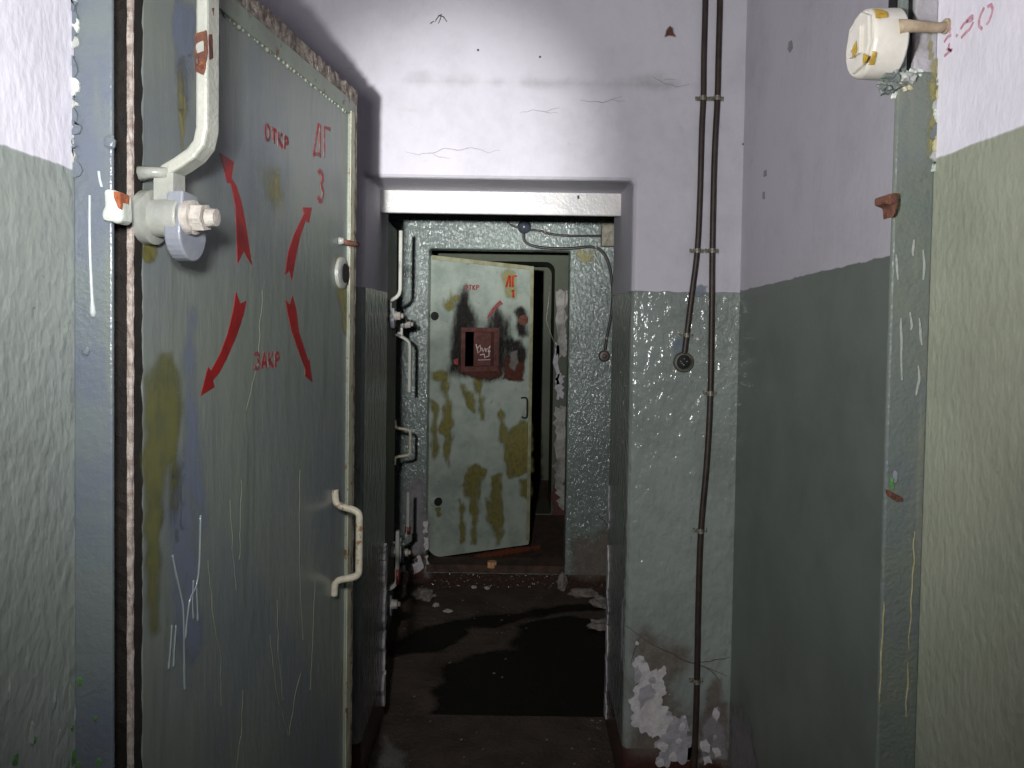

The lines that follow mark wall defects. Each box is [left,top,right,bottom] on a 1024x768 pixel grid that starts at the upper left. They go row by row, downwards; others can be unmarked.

crack [408,147,497,159]
flaking render [875,32,939,172]
flaking render [551,289,568,515]
flaking render [628,633,729,768]